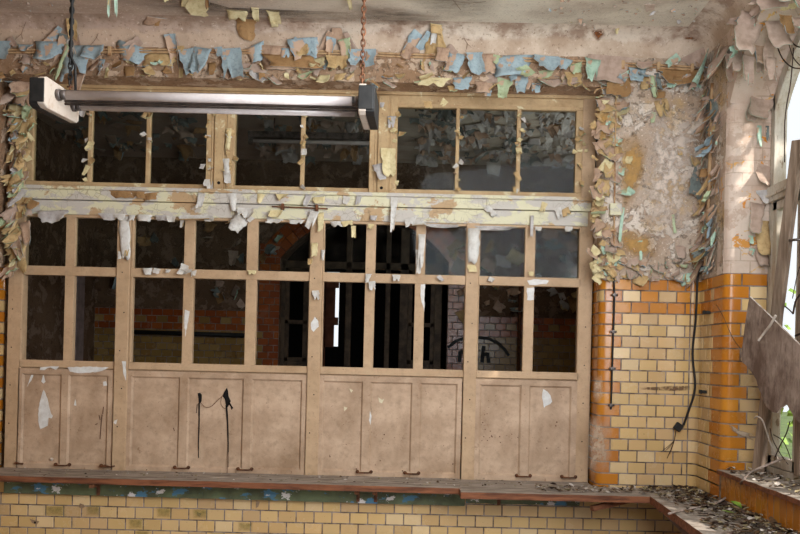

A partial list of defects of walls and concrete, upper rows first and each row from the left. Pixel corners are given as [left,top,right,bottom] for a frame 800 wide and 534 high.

peeling [0,0,800,313]